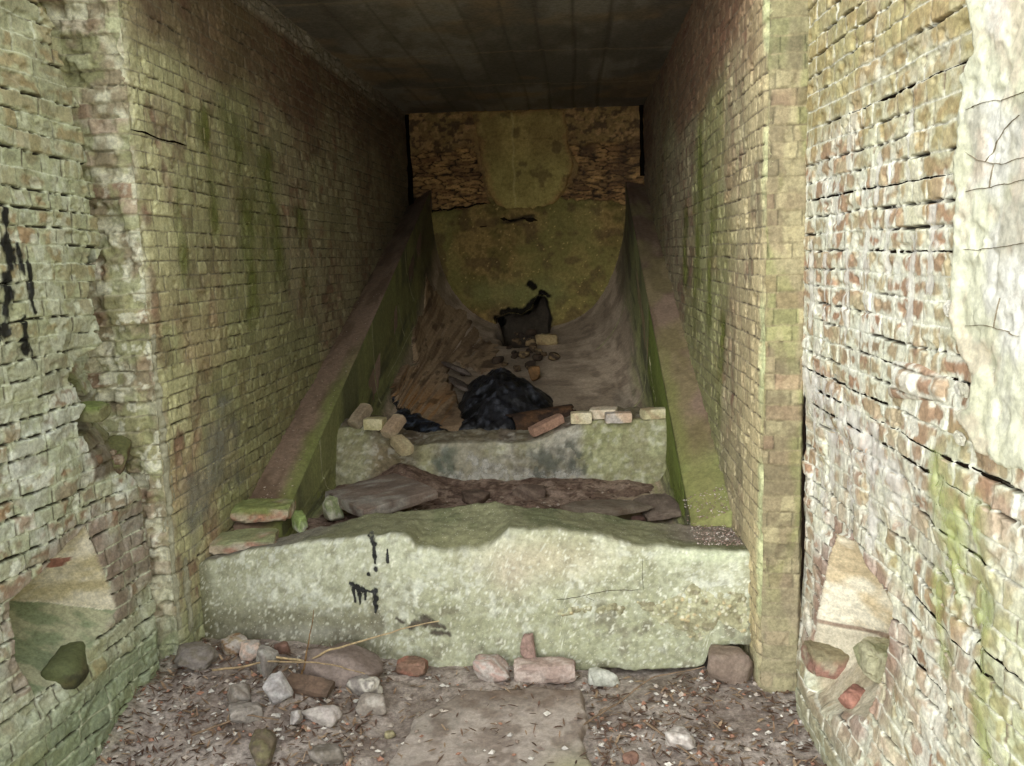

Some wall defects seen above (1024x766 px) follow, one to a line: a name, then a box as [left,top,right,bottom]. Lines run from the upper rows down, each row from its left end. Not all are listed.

crack [131,129,187,146]
peeling [411,109,644,213]
peeling [943,0,1024,473]
crack [971,298,1015,336]
spalling [68,344,101,403]
spalling [75,418,117,483]
crack [800,366,1013,607]